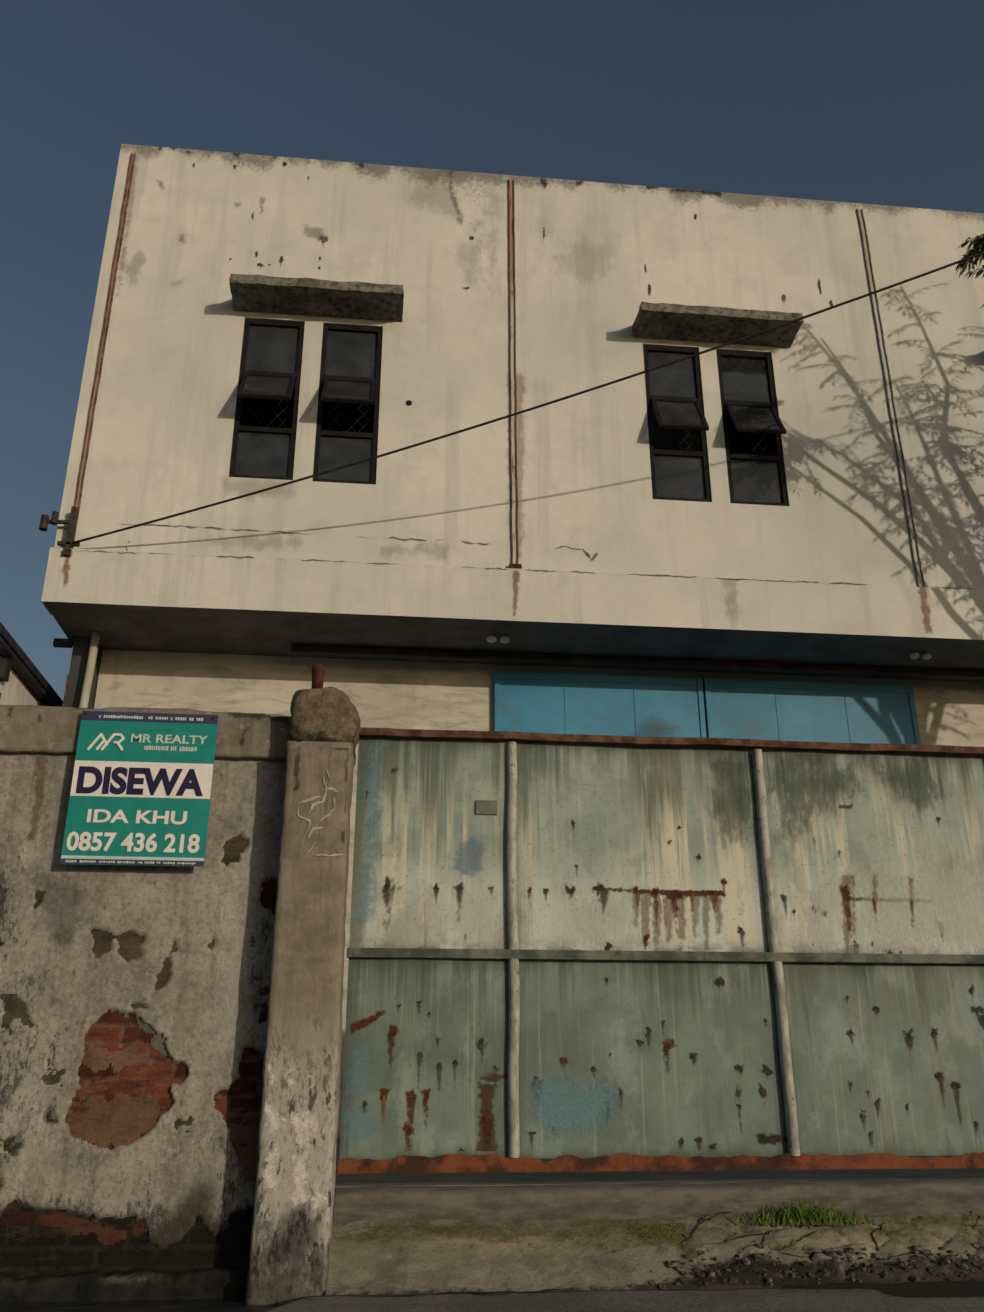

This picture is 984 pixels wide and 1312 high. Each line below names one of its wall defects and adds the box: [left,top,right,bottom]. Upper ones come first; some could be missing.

leakage [647,186,722,196]
flaking render [221,834,249,866]
flaking render [90,929,145,963]
corrosion [593,878,727,916]
corrosion [840,884,931,953]
corrosion [351,1004,401,1064]
flaking render [41,1002,194,1150]
flaking render [214,1047,327,1209]
corrosion [403,1052,458,1147]
corrosion [459,1066,507,1151]
flaking render [0,1200,254,1277]
crack [679,1211,983,1261]